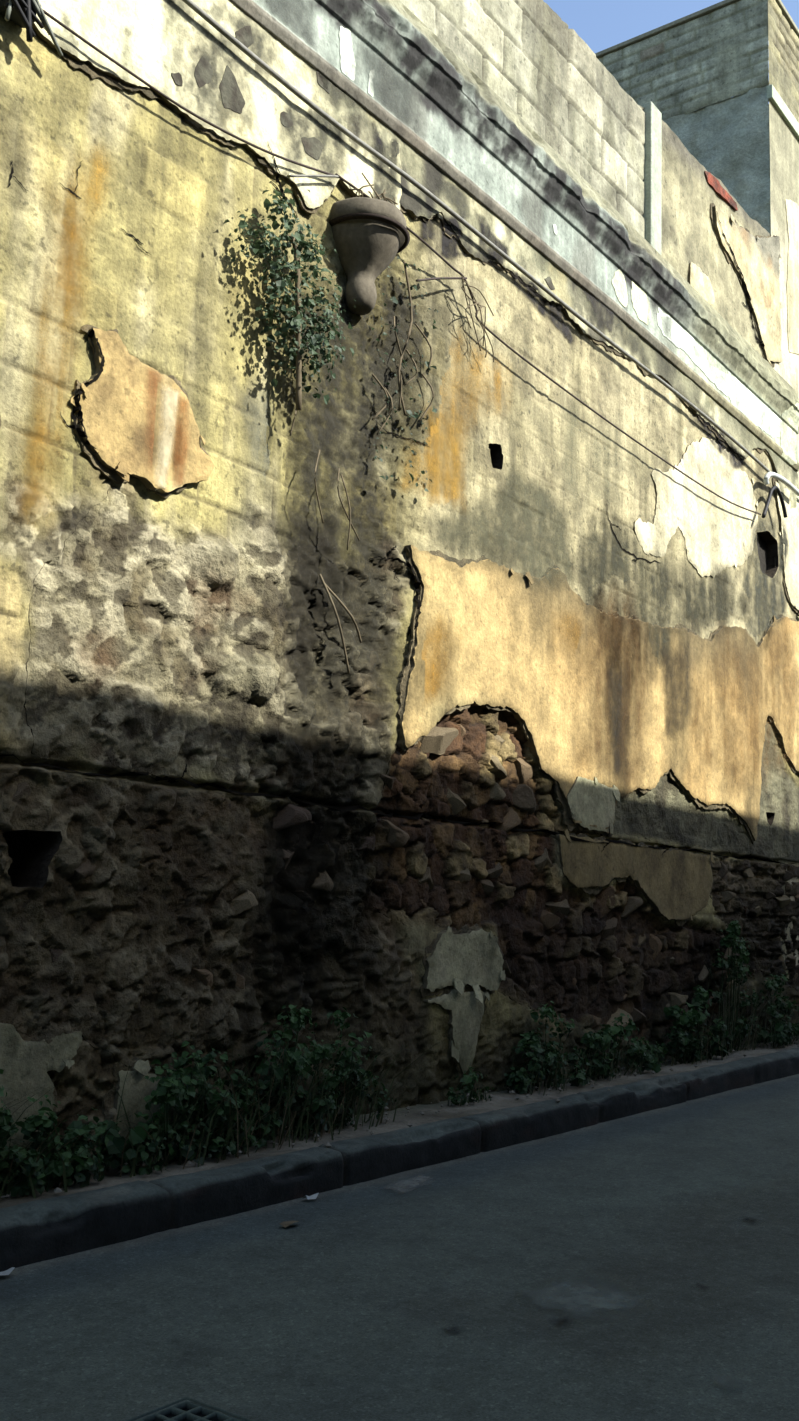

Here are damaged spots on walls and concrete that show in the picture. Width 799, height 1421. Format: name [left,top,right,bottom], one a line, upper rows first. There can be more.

leakage [193,14,272,121]
leakage [266,0,314,44]
leakage [365,49,410,118]
crack [713,210,765,357]
leakage [260,264,425,1024]
flaking render [32,0,799,991]
leakage [437,472,788,664]
spalling [0,324,376,1159]
leakage [610,672,622,771]
flaking render [419,924,506,1077]